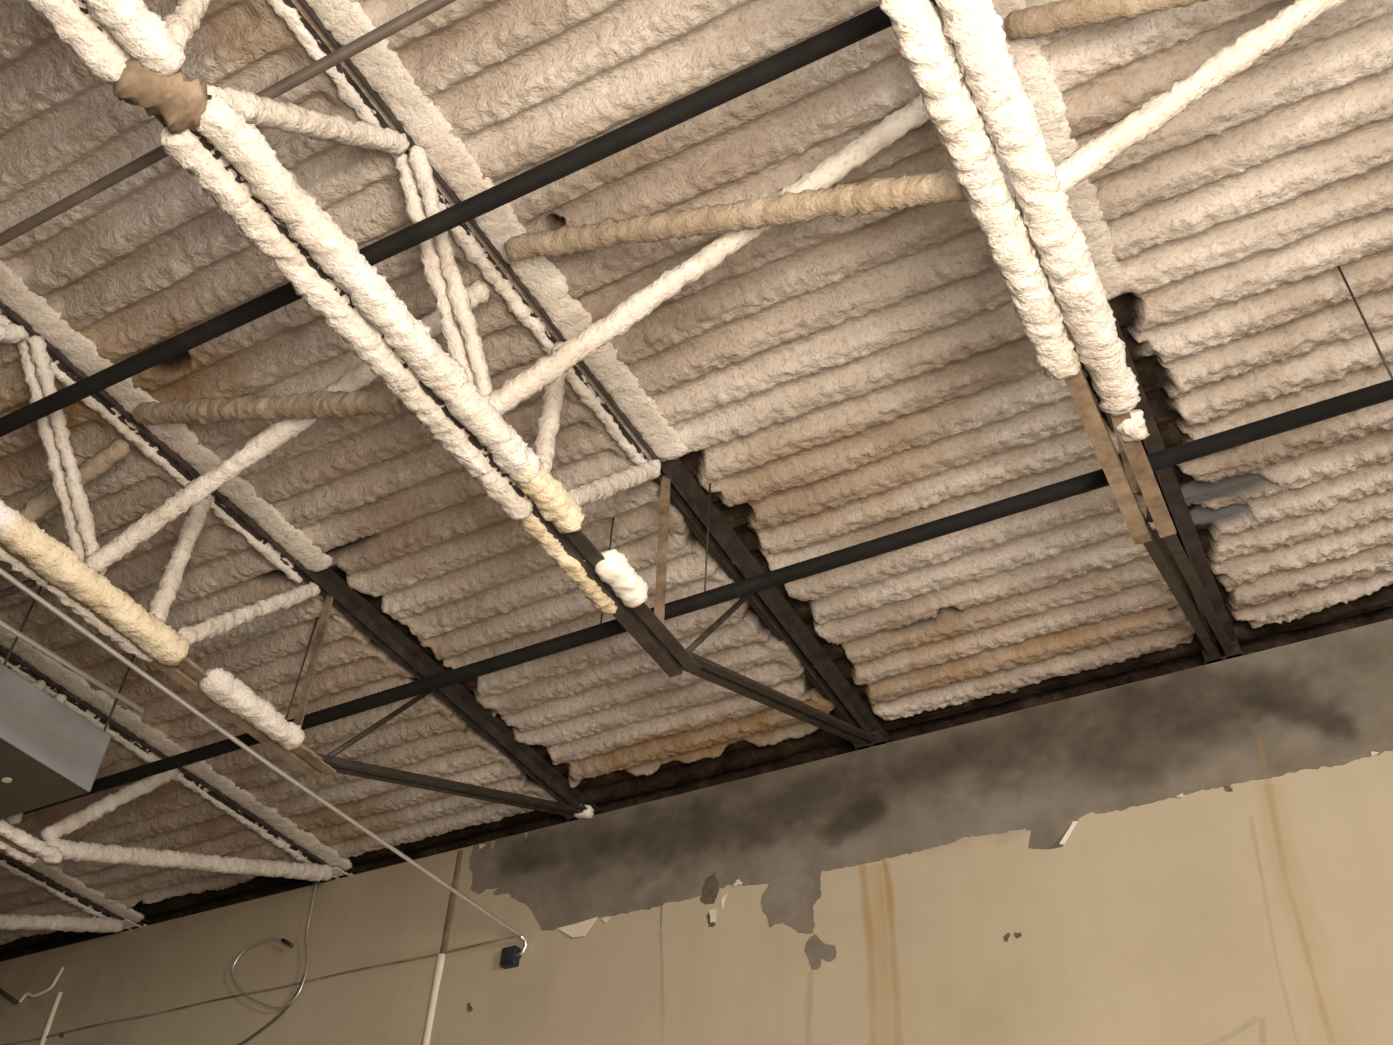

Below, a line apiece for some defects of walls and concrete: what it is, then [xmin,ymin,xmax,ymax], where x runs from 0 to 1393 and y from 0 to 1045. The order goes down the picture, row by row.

peeling [469,619,1393,970]